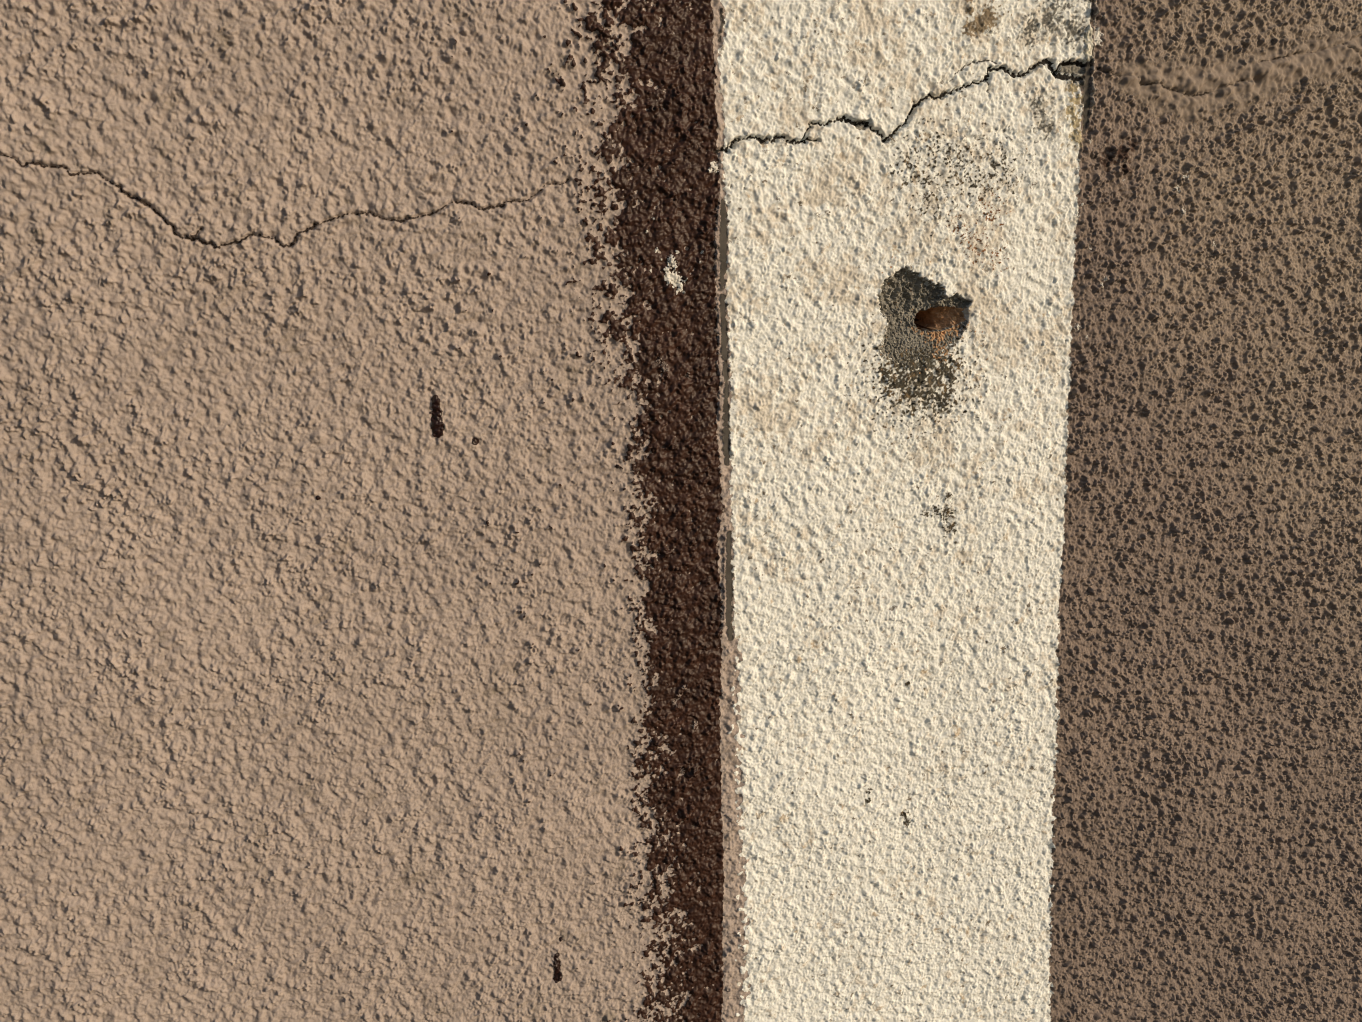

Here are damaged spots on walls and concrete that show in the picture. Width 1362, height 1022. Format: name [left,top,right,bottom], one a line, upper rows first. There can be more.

crack [610,39,1359,178]
crack [3,155,569,249]
spalling [873,266,971,368]
corrosion [912,313,983,374]